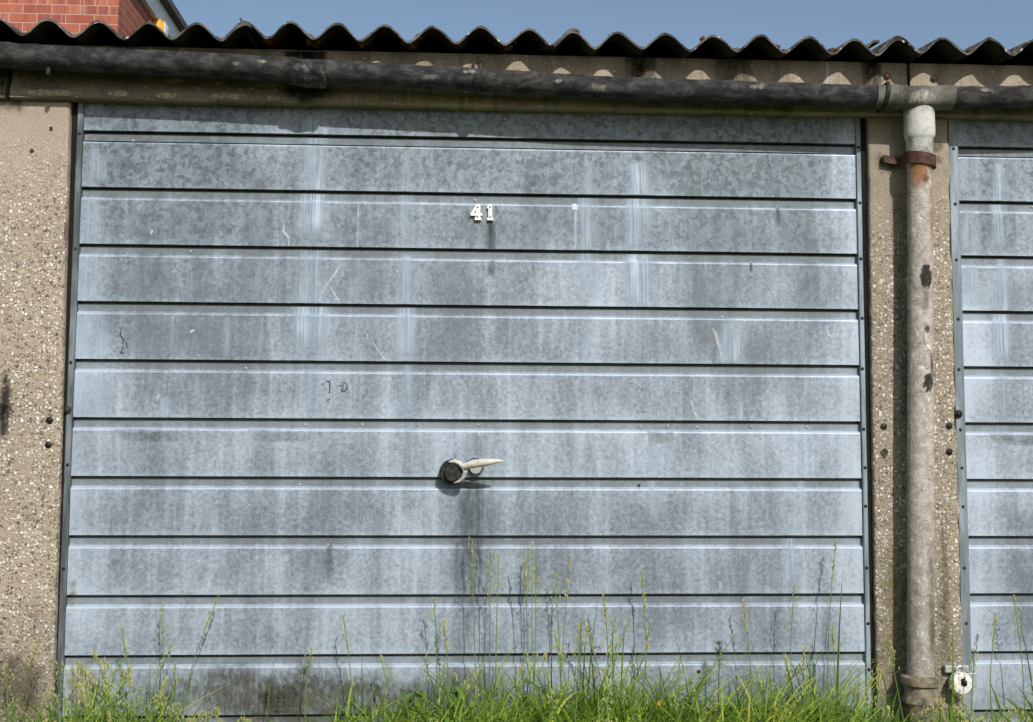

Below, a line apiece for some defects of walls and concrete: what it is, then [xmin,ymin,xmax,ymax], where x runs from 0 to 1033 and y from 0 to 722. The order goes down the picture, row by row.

leakage [285,86,327,103]
leakage [296,119,323,345]
leakage [628,163,649,303]
leakage [0,375,11,431]